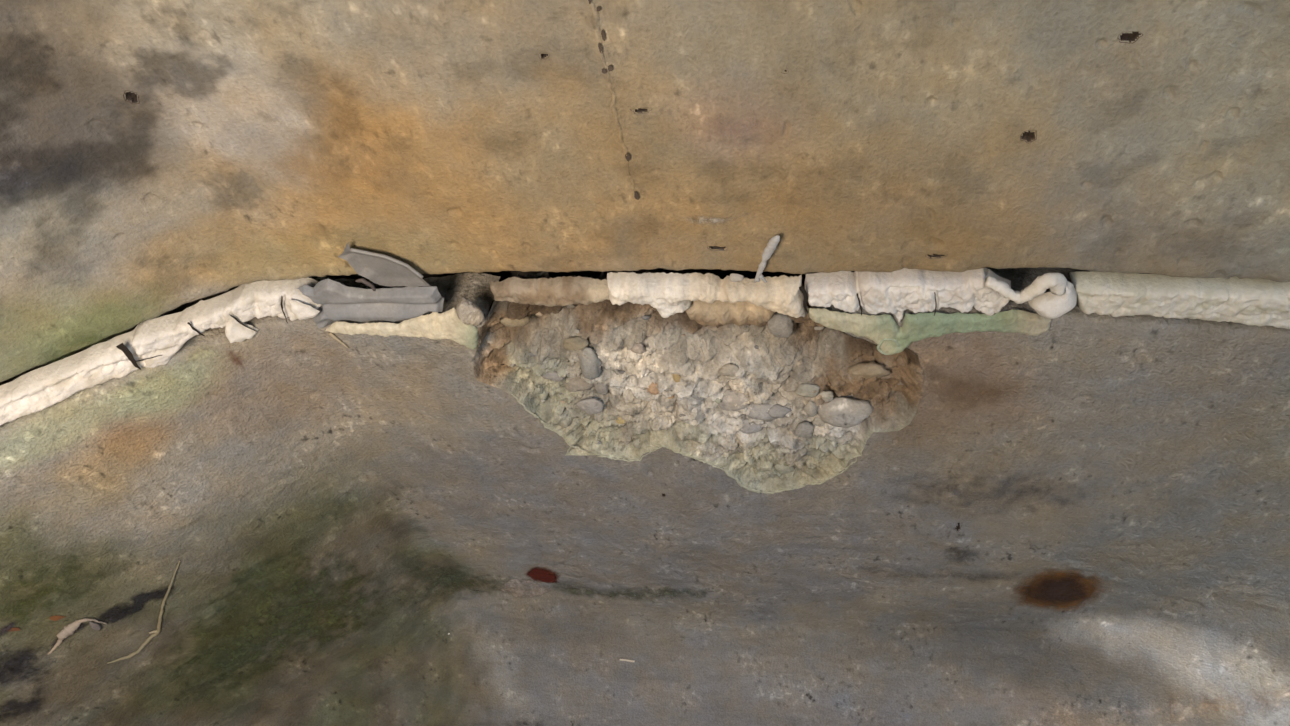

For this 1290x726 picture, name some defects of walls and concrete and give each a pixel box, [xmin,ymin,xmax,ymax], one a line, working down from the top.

spalling [516,271,552,279]
spalling [471,283,924,494]
rust [527,567,558,583]
rust [1019,571,1101,609]
crack [0,586,174,721]